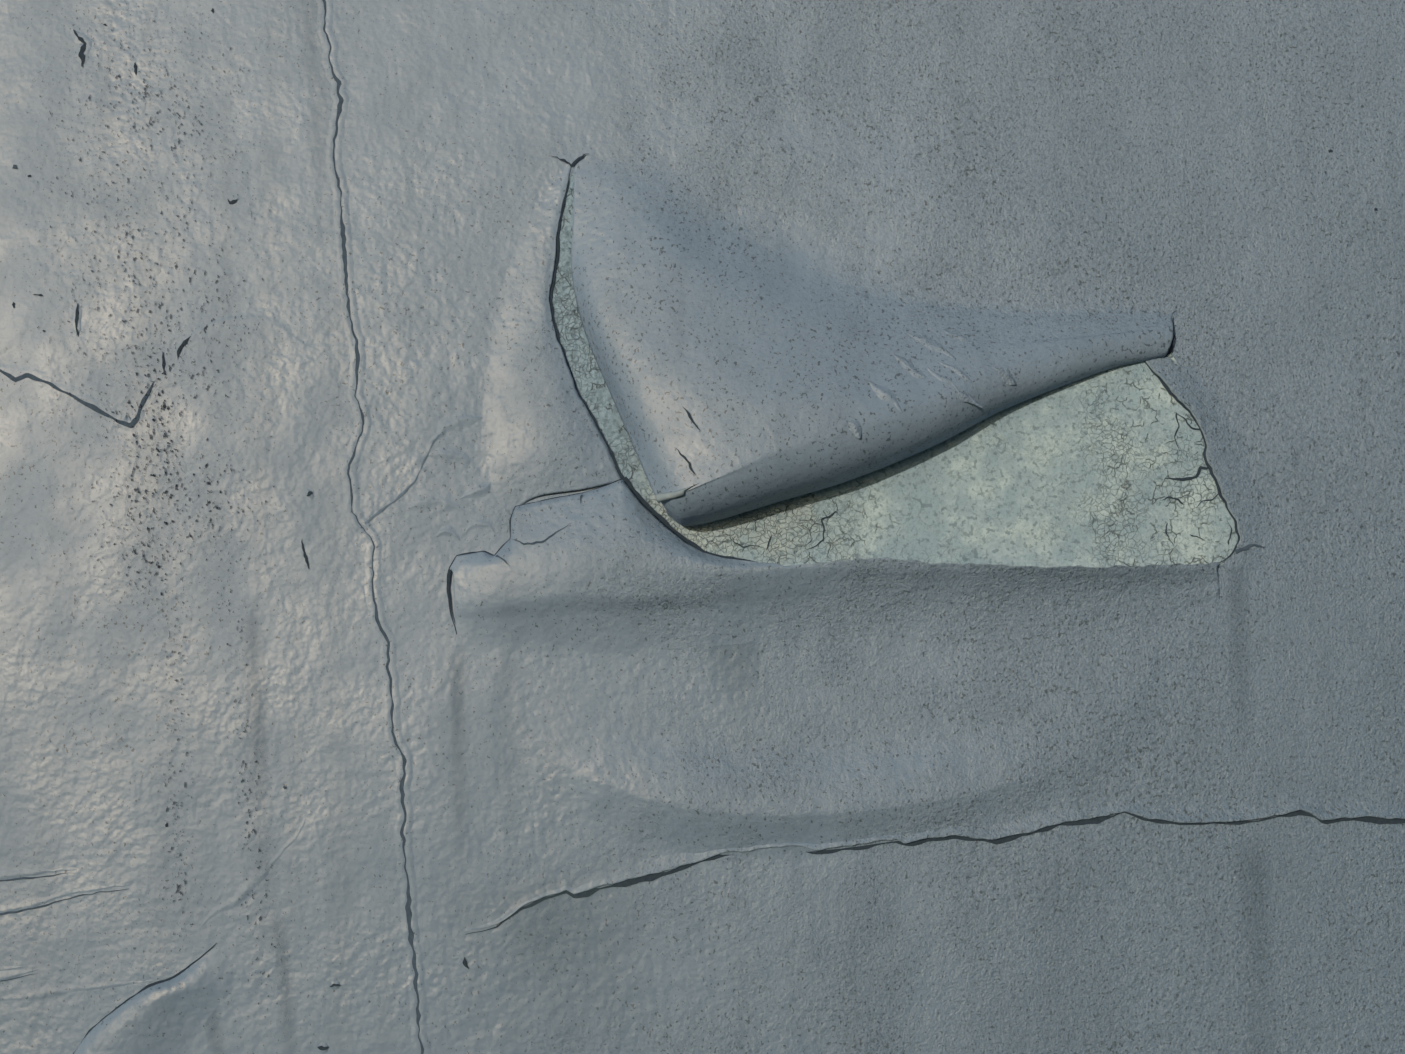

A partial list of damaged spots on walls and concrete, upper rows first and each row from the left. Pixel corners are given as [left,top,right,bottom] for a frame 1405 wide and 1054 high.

crack [0,336,191,432]
crack [316,0,441,1054]
peeling [480,25,1238,568]
crack [465,791,1405,935]